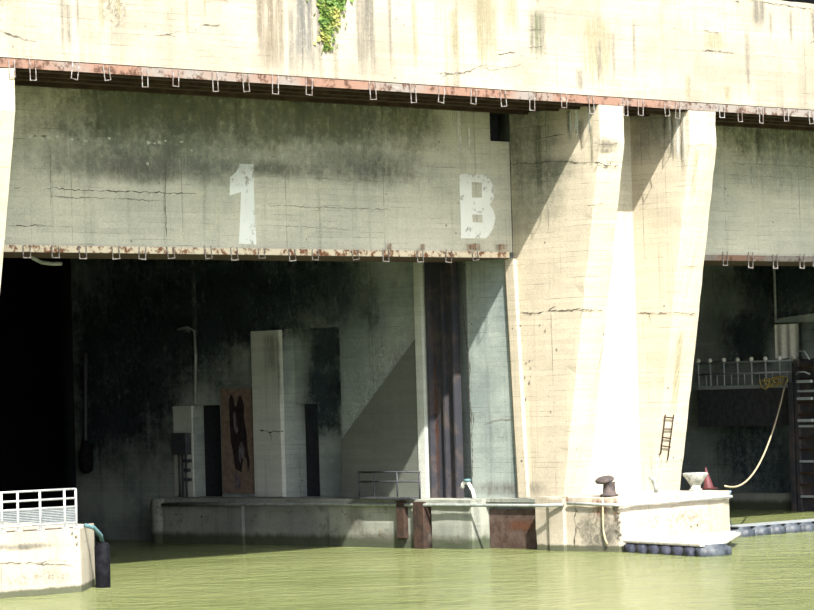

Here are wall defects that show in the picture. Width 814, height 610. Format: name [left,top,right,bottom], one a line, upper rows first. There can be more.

leakage [297,0,311,49]
crack [44,157,195,236]
crack [522,306,602,316]
corrosion [489,509,537,549]